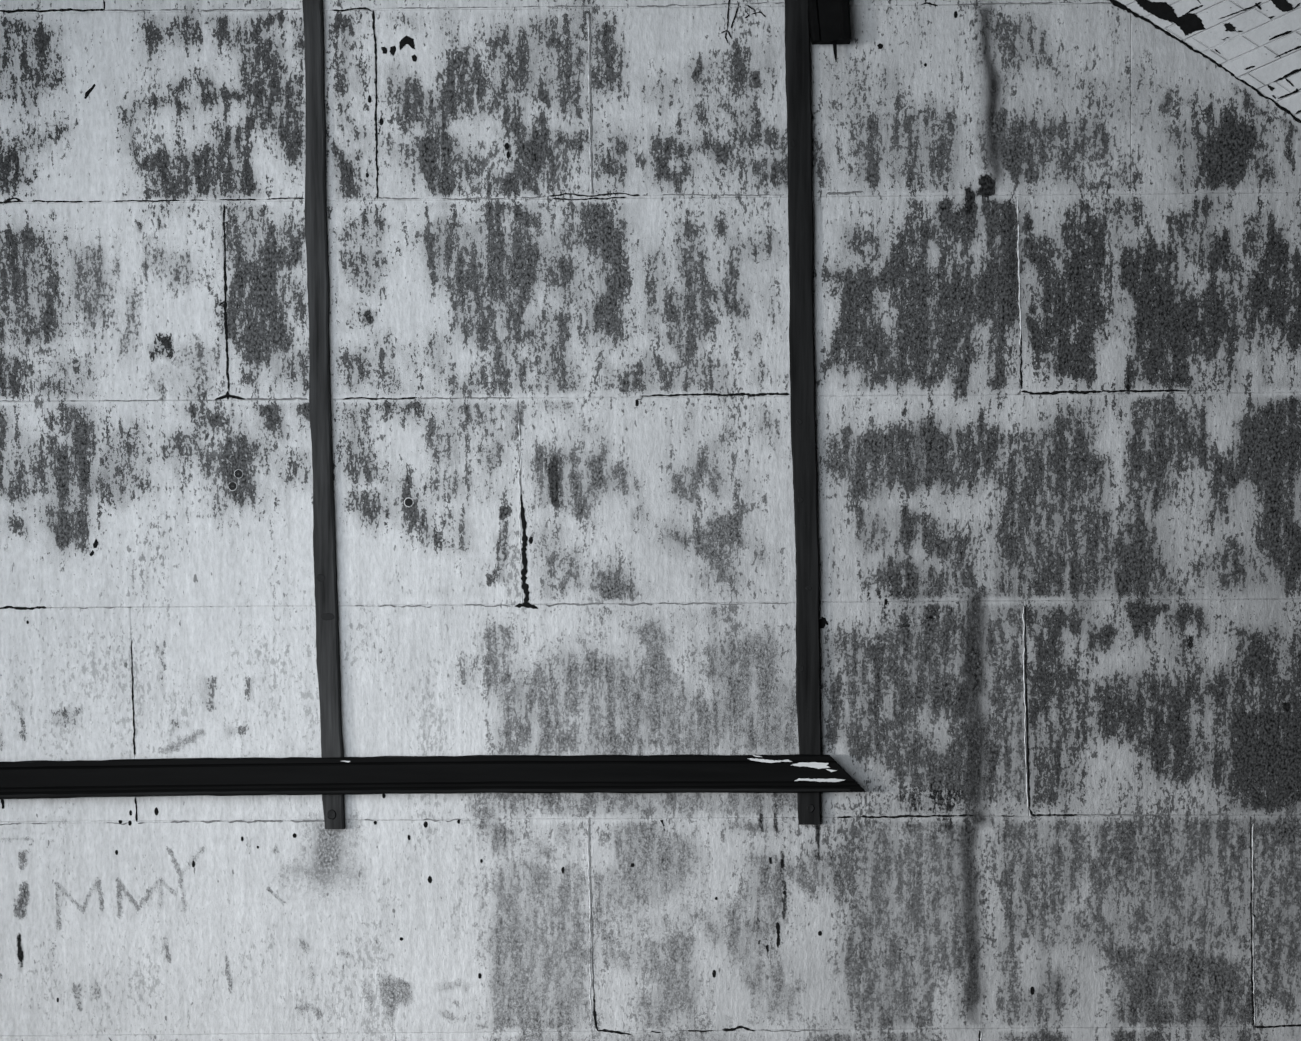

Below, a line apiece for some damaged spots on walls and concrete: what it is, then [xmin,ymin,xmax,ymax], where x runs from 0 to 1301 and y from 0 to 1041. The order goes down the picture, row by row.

crack [0,0,302,13]
crack [333,2,784,200]
spalling [1135,0,1206,36]
peeling [1271,0,1294,12]
crack [0,197,306,401]
damp [0,0,313,571]
damp [325,0,799,756]
crack [642,390,789,398]
crack [343,396,788,610]
damp [442,0,1301,1041]
damp [202,676,216,712]
damp [363,975,411,1020]